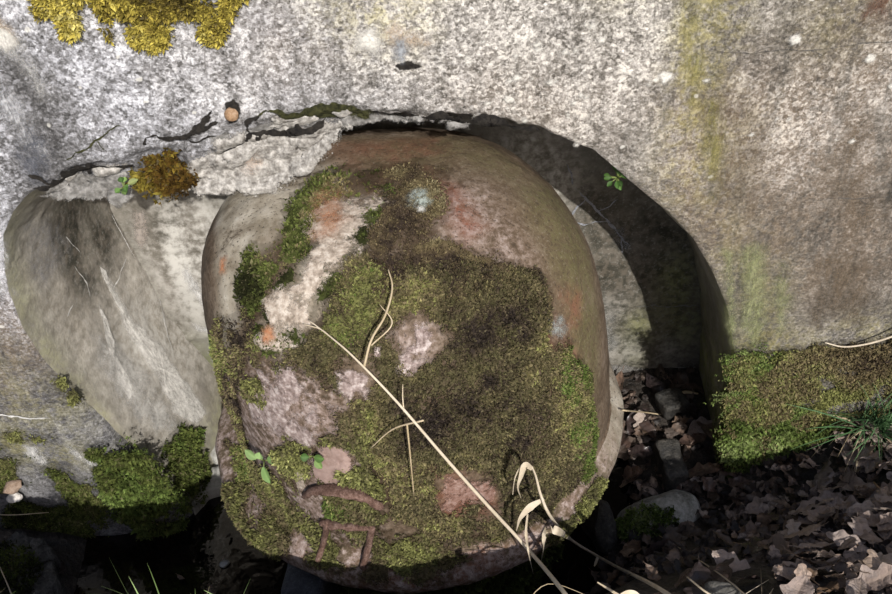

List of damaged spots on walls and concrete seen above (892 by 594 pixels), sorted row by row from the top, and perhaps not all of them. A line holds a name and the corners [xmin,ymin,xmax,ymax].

crack [143,102,540,154]
crack [28,125,136,191]
spalling [41,162,134,209]